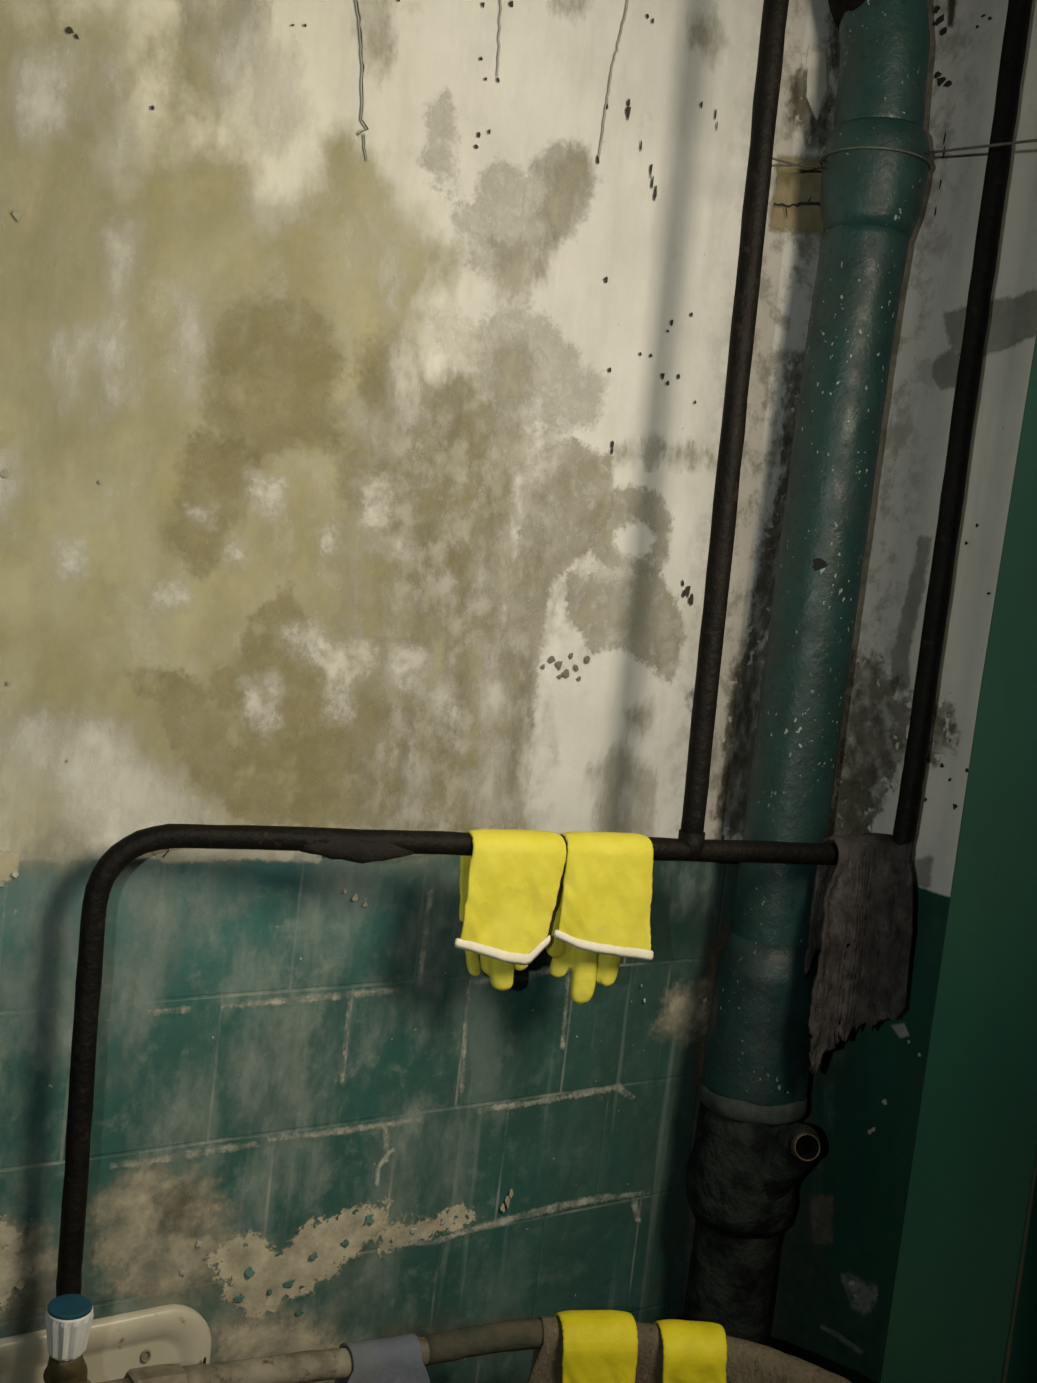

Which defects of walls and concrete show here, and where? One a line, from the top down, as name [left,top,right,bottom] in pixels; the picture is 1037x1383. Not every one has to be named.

crack [355,0,369,161]
crack [598,0,629,157]
leakage [933,307,967,389]
leakage [983,290,1037,355]
leakage [0,0,686,868]
leakage [717,353,805,837]
leakage [828,537,930,837]
leakage [926,702,958,765]
leakage [912,857,932,887]
peeling [492,1085,635,1111]
peeling [0,1215,58,1327]
peeling [93,1105,641,1326]